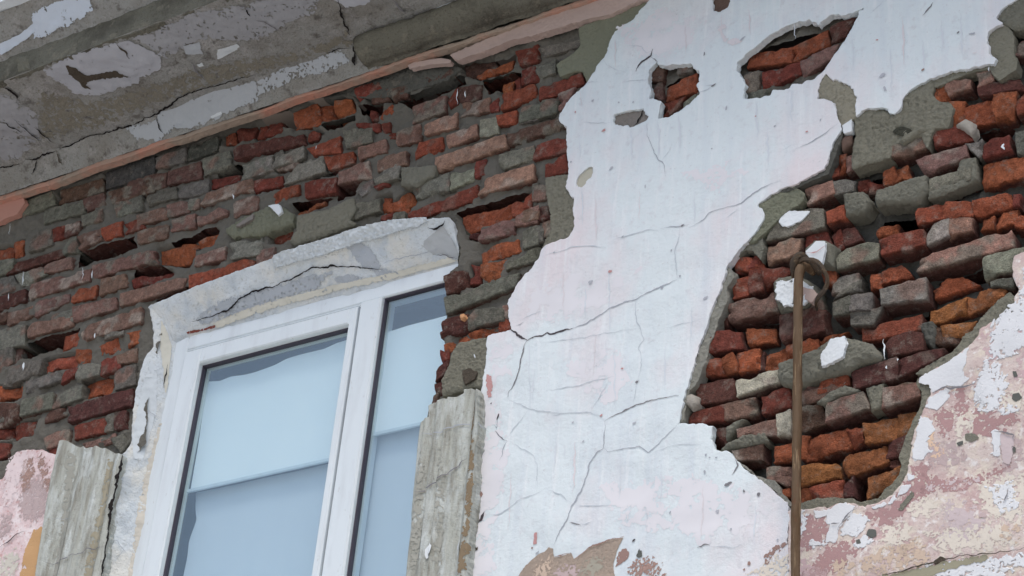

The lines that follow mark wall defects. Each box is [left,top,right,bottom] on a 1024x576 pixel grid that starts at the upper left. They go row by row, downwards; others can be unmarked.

crack [0,59,253,172]
crack [586,45,656,84]
crack [635,110,667,171]
spalling [652,65,700,118]
crack [192,221,457,322]
spalling [0,0,666,576]
spalling [680,0,1024,576]
crack [418,181,779,539]
crack [934,380,977,392]
crack [49,455,128,576]